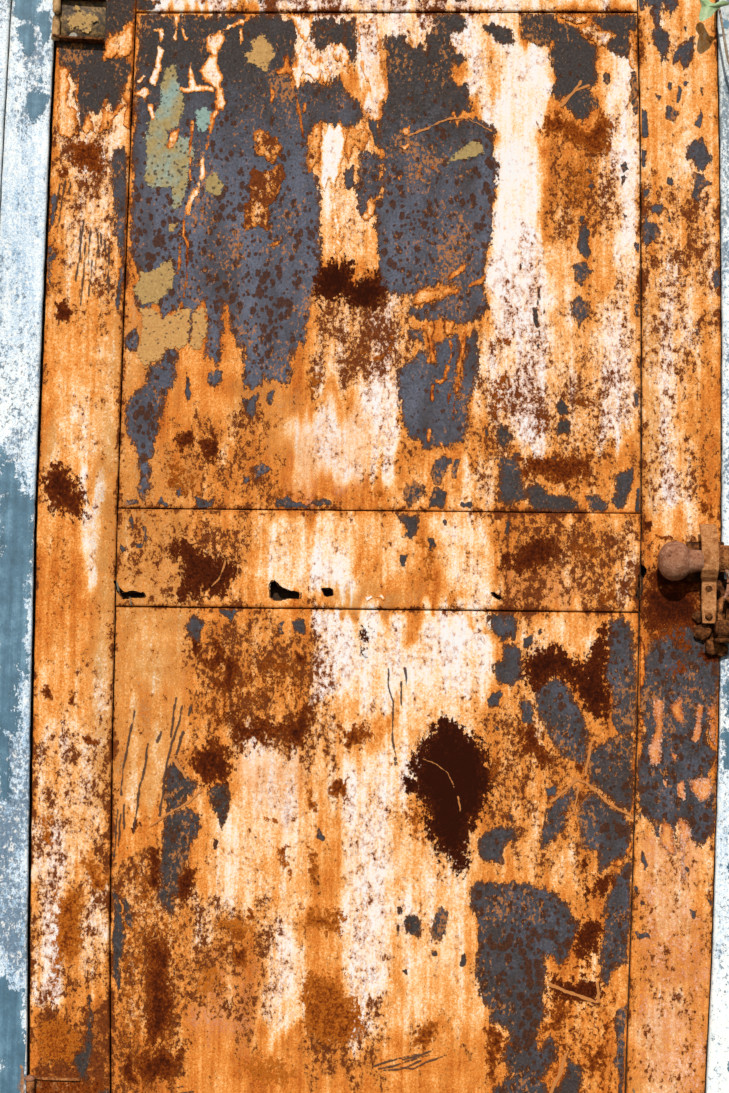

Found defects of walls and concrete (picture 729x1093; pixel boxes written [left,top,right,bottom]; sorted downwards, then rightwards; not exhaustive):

peeling [481,0,697,167]
peeling [12,0,500,553]
rust [307,253,389,314]
peeling [485,419,640,513]
peeling [0,446,34,805]
rust [183,636,318,793]
rust [402,712,594,880]
rust [517,621,620,730]
peeling [519,614,729,987]
rust [20,845,227,1093]
peeling [460,879,585,1093]
rust [535,914,620,1093]